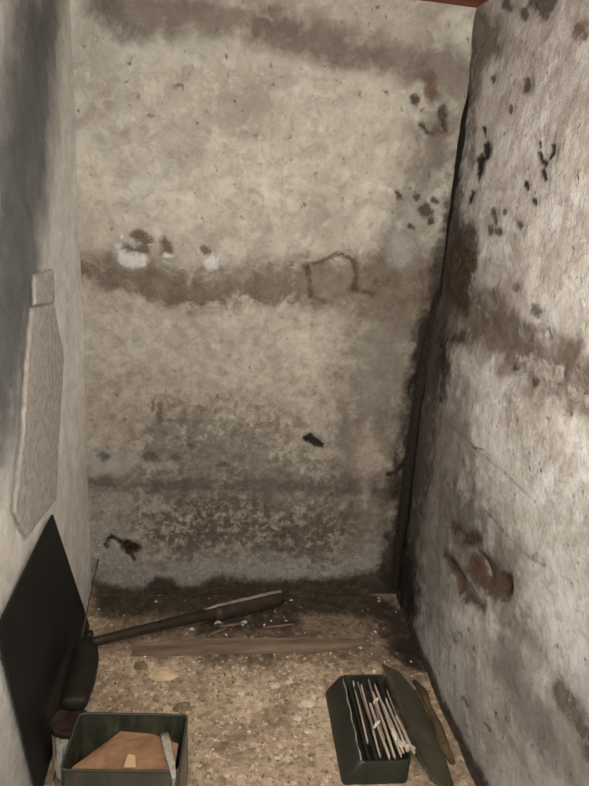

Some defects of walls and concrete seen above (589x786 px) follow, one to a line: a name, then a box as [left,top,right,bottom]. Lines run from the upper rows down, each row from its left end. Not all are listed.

leakage [95,0,241,36]
leakage [247,14,353,63]
leakage [502,0,557,21]
leakage [356,10,500,121]
peeling [114,230,173,268]
peeling [201,246,219,270]
crack [387,94,469,594]
leakage [80,112,589,786]
spalling [443,523,513,612]